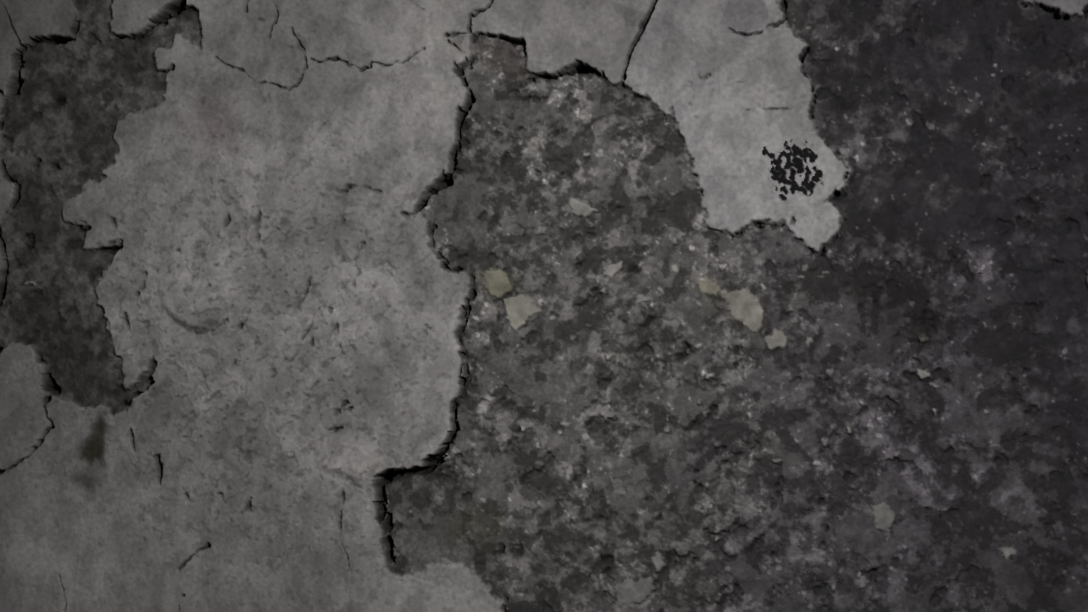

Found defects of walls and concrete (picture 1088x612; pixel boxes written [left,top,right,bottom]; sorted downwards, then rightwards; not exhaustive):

crack [216,0,494,93]
crack [621,0,659,84]
crack [727,20,786,37]
spalling [0,0,203,415]
spalling [371,0,1088,612]
crack [0,396,55,475]